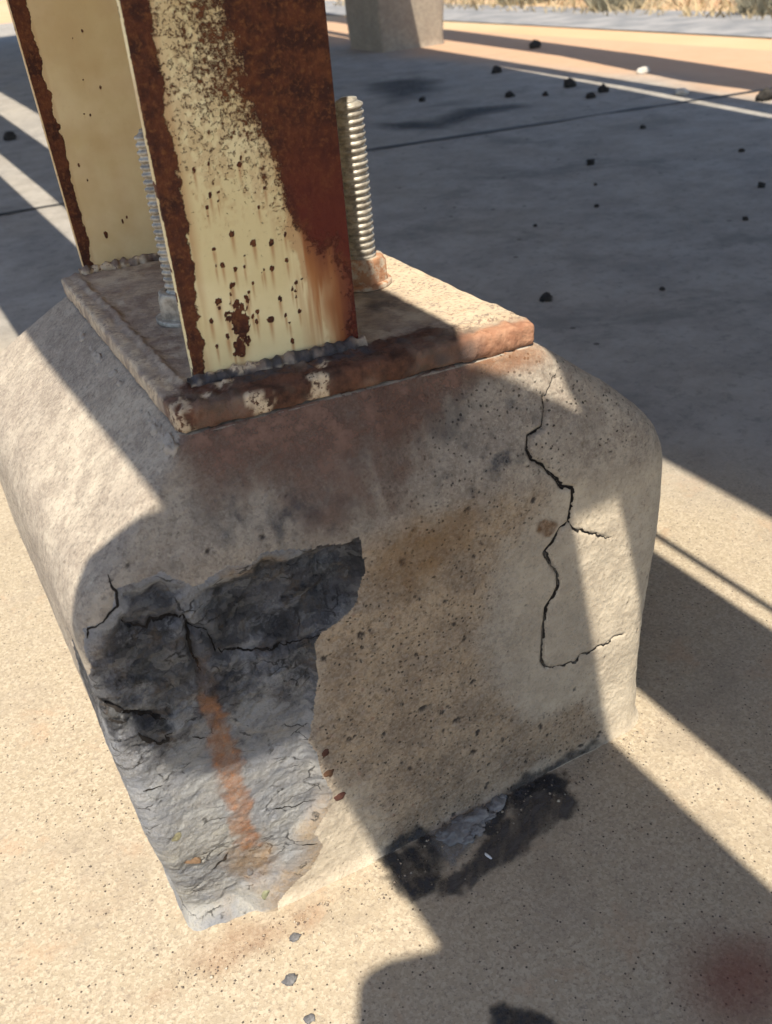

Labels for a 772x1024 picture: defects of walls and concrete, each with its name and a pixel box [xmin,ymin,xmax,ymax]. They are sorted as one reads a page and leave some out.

crack [86,574,319,671]
spalling [67,537,365,931]
damp [387,740,596,894]
crack [525,370,624,668]